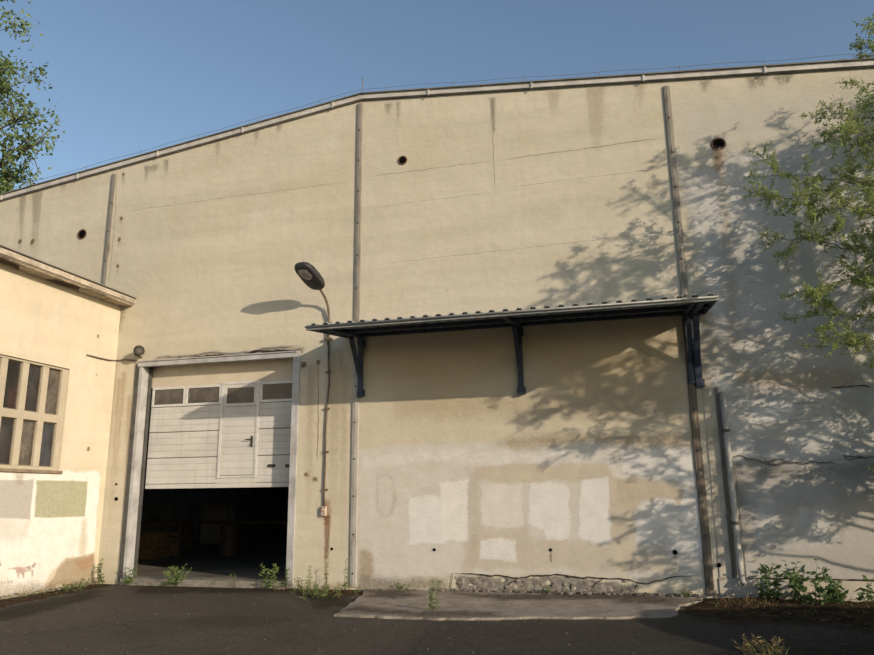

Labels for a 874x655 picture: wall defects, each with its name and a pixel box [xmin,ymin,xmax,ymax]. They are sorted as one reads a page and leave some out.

crack [367,97,658,207]
crack [732,454,872,465]
rust [322,499,332,586]
crack [450,573,686,591]